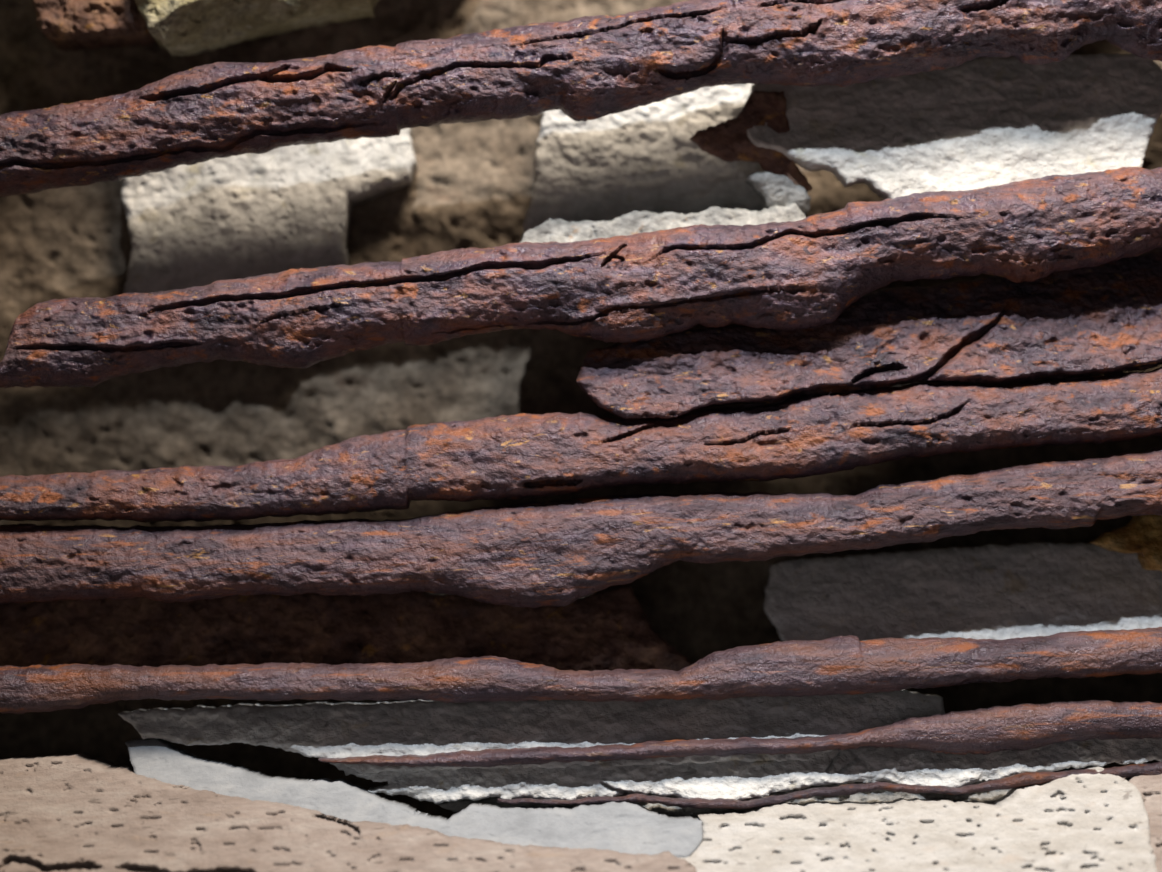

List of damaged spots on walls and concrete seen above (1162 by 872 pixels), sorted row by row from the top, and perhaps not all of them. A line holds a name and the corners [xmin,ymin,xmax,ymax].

rust [1090,515,1162,572]